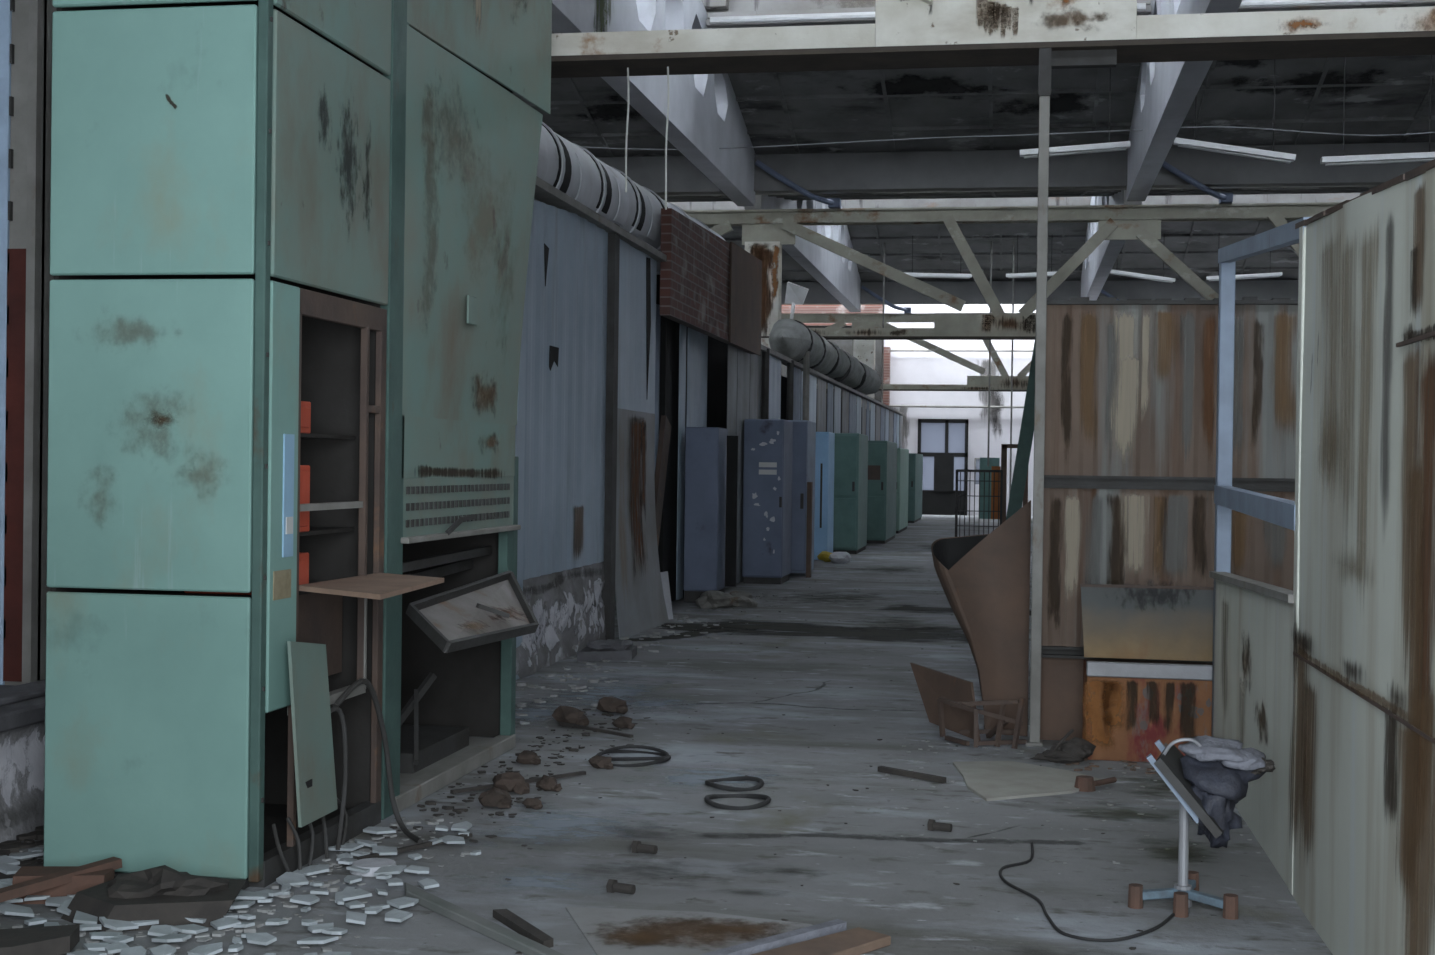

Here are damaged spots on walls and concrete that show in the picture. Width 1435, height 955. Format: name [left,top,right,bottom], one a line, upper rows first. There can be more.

rust [977,0,1019,36]
rust [1045,0,1106,27]
rust [1061,313,1117,449]
rust [1141,311,1216,455]
rust [1233,313,1296,446]
peeling [521,570,604,672]
rust [630,416,647,573]
rust [1048,496,1129,626]
rust [1153,495,1206,576]
rust [1233,510,1246,566]
rust [1289,159,1435,955]
peeling [0,728,45,807]